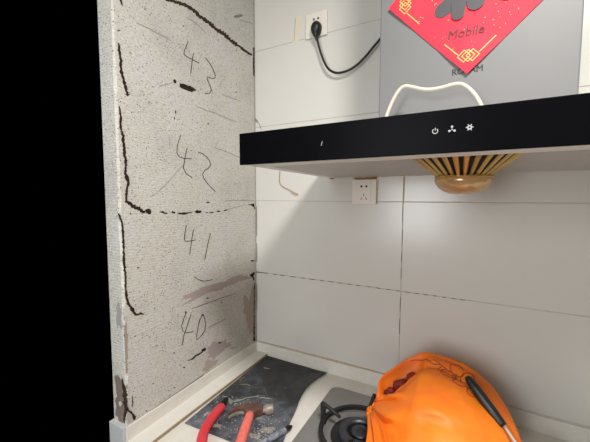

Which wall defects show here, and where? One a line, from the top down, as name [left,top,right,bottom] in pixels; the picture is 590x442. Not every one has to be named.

crack [166,0,255,76]
crack [117,30,145,316]
spalling [114,374,132,424]